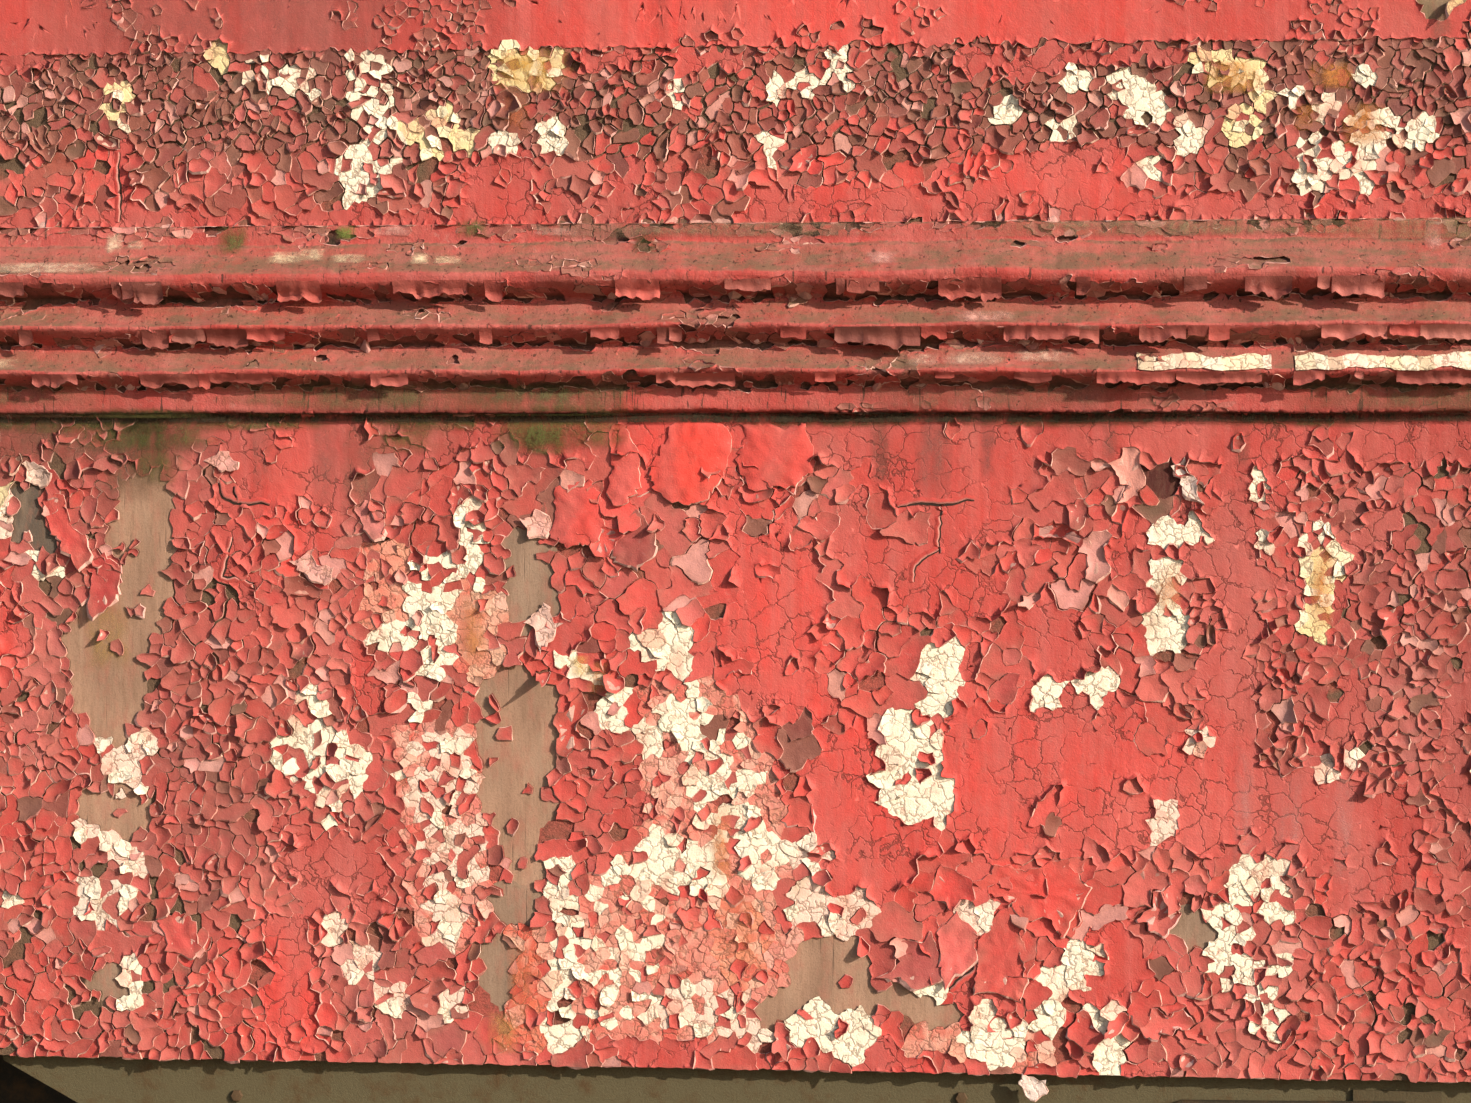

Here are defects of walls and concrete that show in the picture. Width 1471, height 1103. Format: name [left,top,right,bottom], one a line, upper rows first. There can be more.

peeling [0,413,1471,1102]
crack [897,494,974,582]